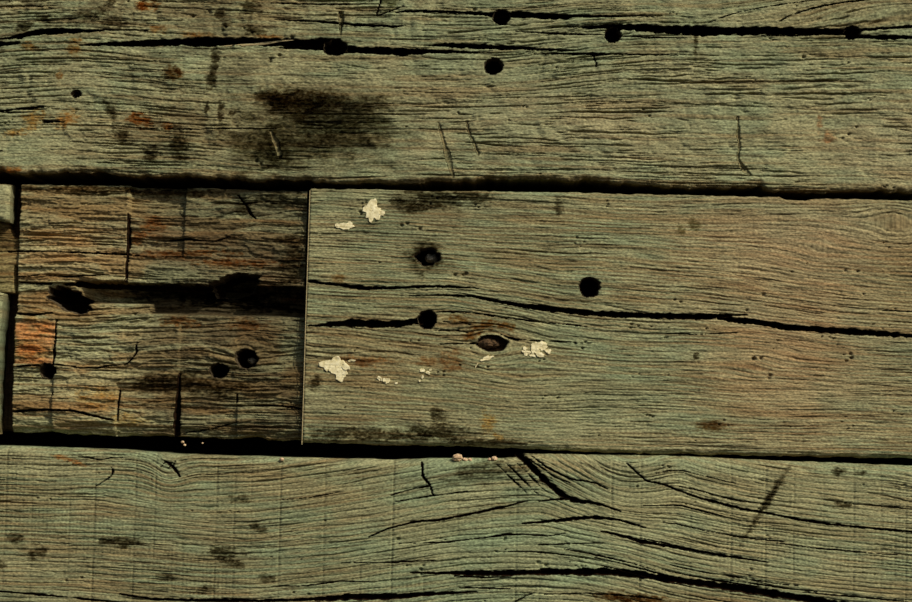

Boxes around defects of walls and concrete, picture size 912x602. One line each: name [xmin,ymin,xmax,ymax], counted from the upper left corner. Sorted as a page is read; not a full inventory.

crack [0,0,912,67]
leakage [205,88,398,169]
crack [0,237,228,295]
crack [247,280,912,344]
peeling [323,359,356,383]
peeling [522,341,551,357]
crack [0,452,912,602]